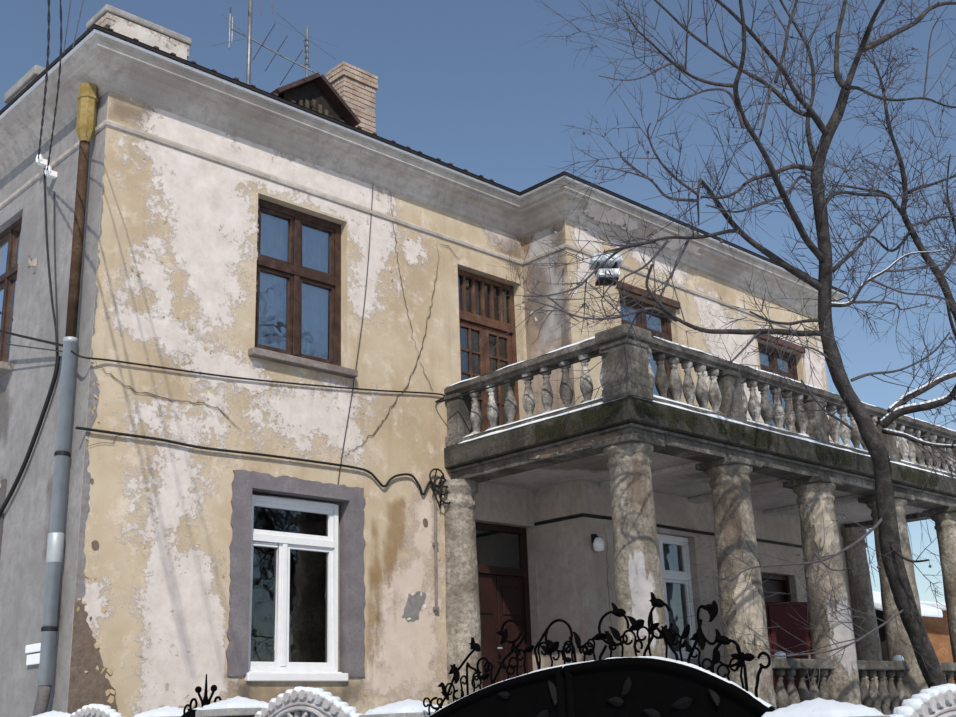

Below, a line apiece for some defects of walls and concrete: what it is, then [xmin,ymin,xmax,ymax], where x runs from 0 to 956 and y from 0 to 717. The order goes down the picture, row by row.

flaking render [67,349,124,714]
crack [96,364,242,431]
peeling [92,98,428,715]
crack [345,191,458,456]
peeling [628,547,660,653]